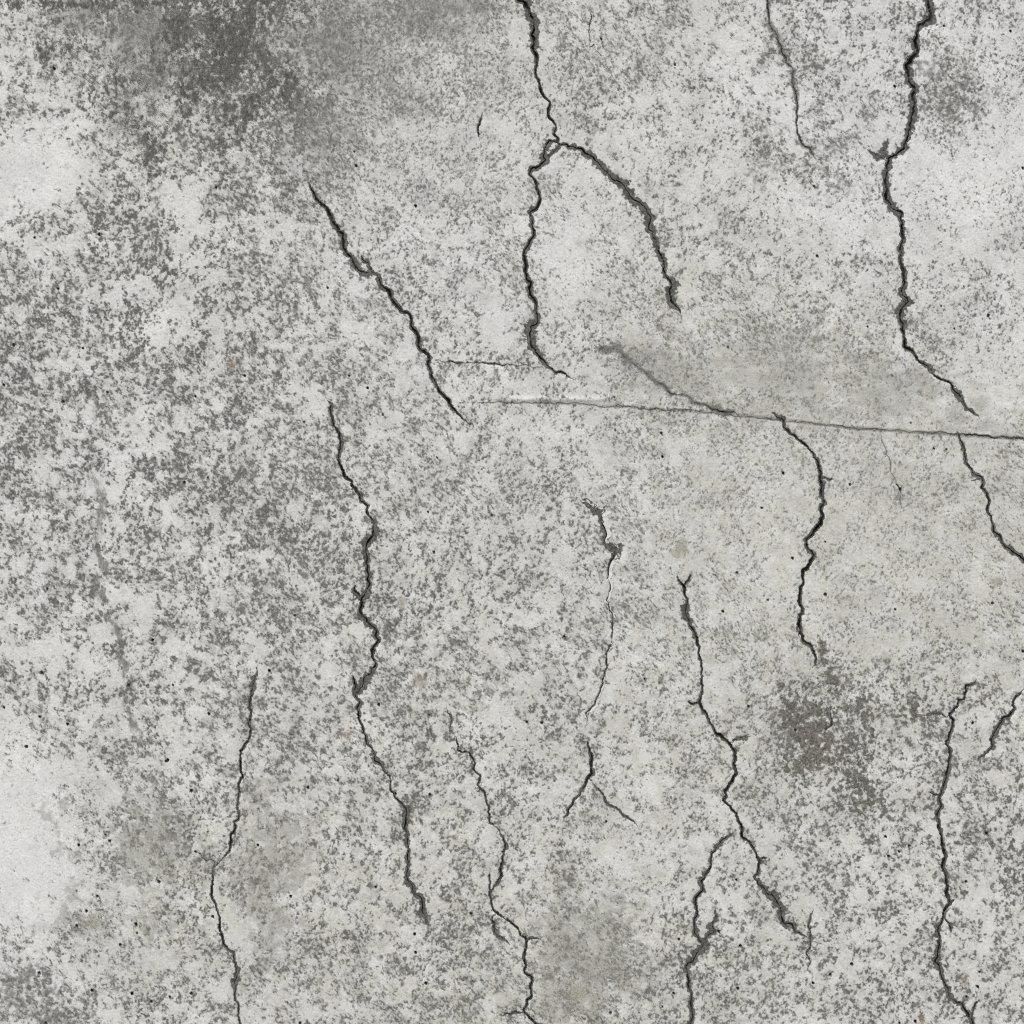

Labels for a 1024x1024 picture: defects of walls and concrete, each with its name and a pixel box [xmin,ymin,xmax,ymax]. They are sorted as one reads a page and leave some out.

crack [308,182,473,425]
crack [514,0,681,377]
crack [766,0,814,156]
crack [869,0,1024,563]
crack [200,667,258,1024]
crack [327,400,428,924]
crack [446,707,540,1024]
crack [563,498,634,822]
crack [677,577,813,1024]
crack [772,411,832,665]
crack [924,682,979,1024]
crack [977,691,1022,761]